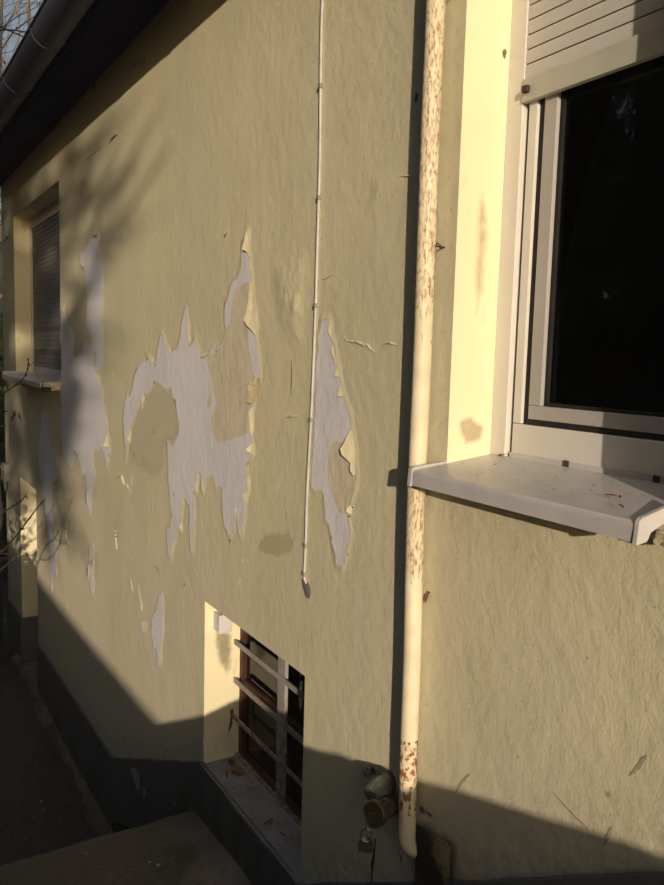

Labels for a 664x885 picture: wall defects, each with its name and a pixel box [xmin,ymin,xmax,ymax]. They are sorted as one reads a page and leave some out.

corrosion [416,1,445,263]
peeling [36,223,112,601]
peeling [122,223,263,563]
peeling [309,312,360,574]
peeling [129,578,165,669]
corrosion [398,739,418,818]